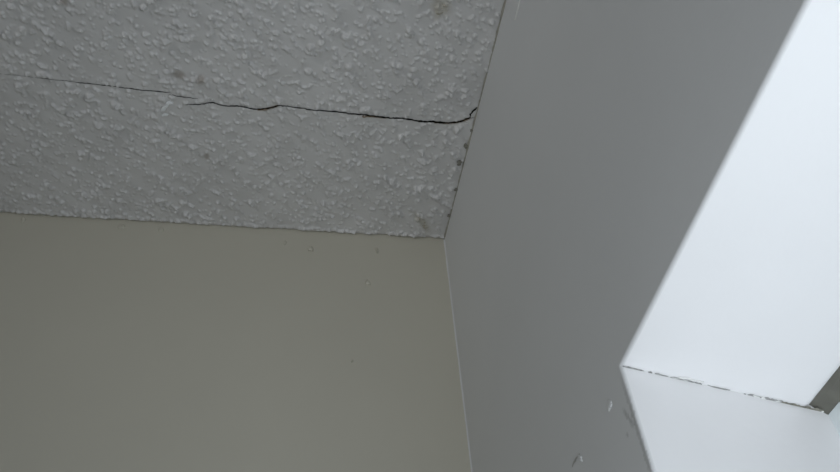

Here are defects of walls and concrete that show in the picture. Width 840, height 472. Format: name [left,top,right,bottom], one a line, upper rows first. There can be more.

crack [5,74,477,125]